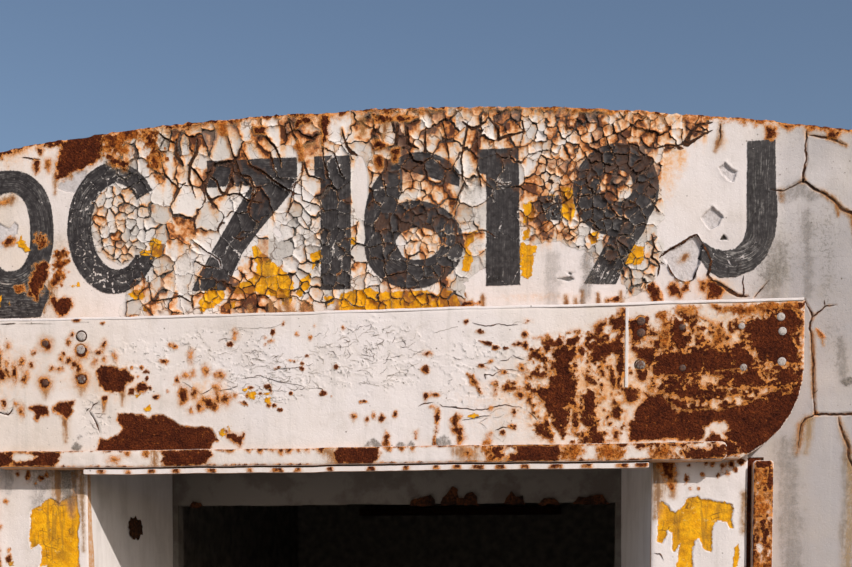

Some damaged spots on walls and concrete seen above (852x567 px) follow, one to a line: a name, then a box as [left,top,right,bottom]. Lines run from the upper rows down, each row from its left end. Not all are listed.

spalling [58,171,87,192]
crack [156,129,358,216]
rust [0,106,668,195]
peeling [88,107,713,317]
crack [373,118,525,211]
rust [680,114,852,152]
crack [774,131,852,225]
rust [13,231,81,322]
rust [0,280,805,567]
crack [796,299,852,567]
peeling [29,496,80,567]
peeling [657,496,734,567]